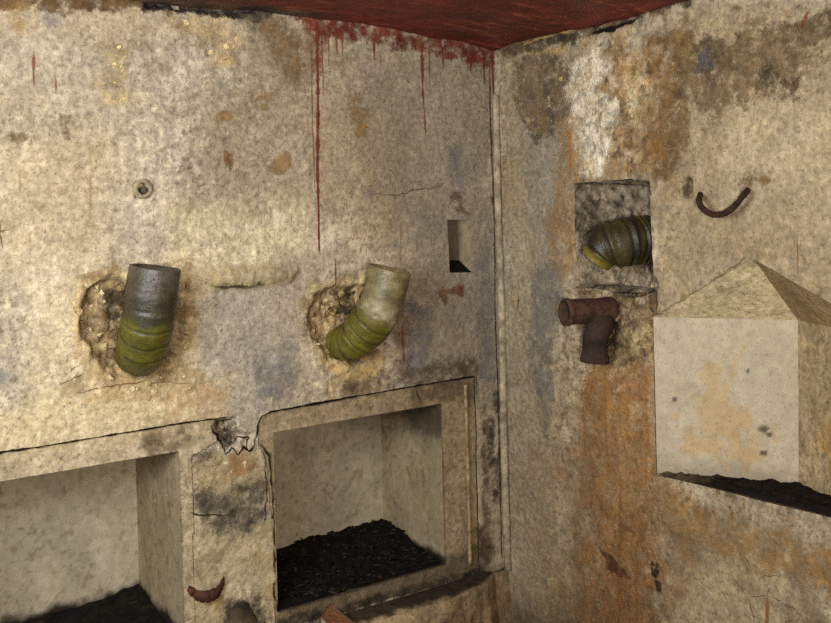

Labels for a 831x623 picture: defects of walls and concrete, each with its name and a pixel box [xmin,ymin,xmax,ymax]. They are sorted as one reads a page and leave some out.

corrosion [294,16,495,251]
damp [593,19,636,33]
damp [646,8,831,180]
flaking render [63,261,205,404]
flaking render [296,272,407,398]